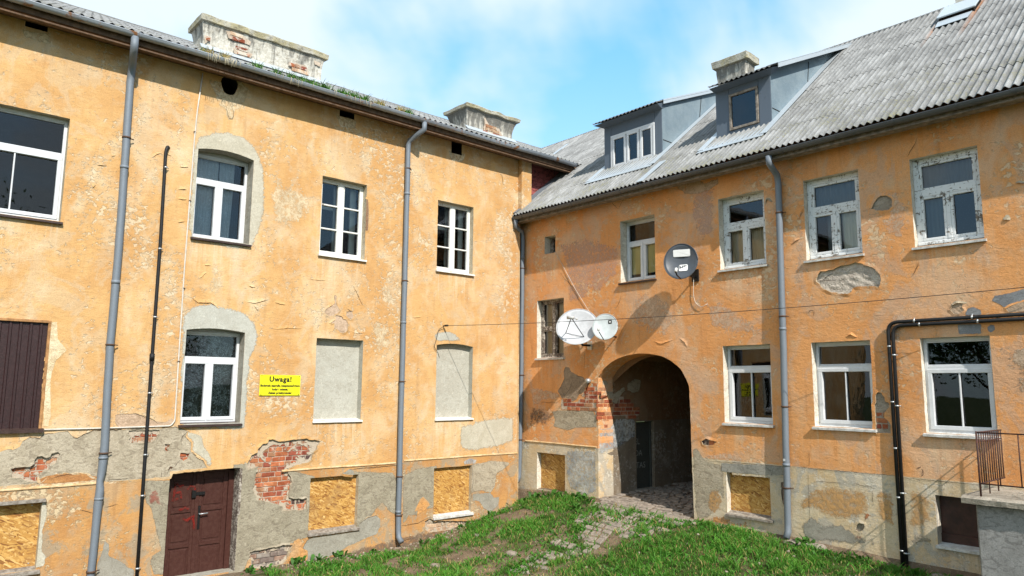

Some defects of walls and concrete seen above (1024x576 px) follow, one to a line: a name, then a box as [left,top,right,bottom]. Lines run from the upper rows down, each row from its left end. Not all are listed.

flaking render [869,193,896,214]
flaking render [813,259,884,297]
flaking render [1003,300,1024,313]
flaking render [552,365,641,430]
flaking render [871,389,893,436]
flaking render [0,414,209,576]
flaking render [229,436,323,573]
flaking render [352,466,471,535]
flaking render [471,461,510,493]
flaking render [693,436,724,518]
flaking render [852,520,868,535]